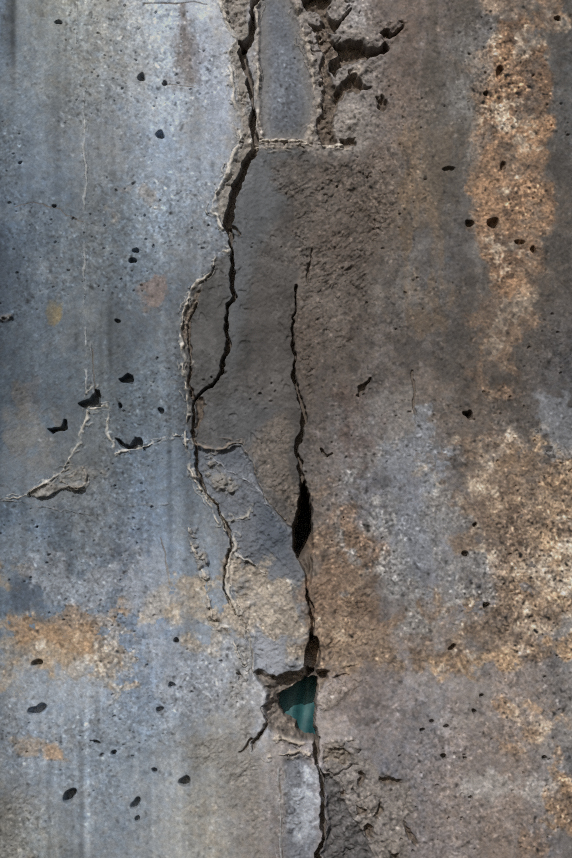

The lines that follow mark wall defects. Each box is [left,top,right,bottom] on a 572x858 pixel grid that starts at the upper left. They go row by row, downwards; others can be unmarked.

crack [144,0,208,8]
crack [187,0,261,495]
corrosion [391,0,572,403]
peeling [167,0,420,858]
crack [291,249,334,677]
crack [357,377,372,398]
crack [223,526,250,632]
corrosion [308,421,572,686]
corrosion [0,597,141,705]
crack [239,738,253,753]
crack [313,736,327,858]